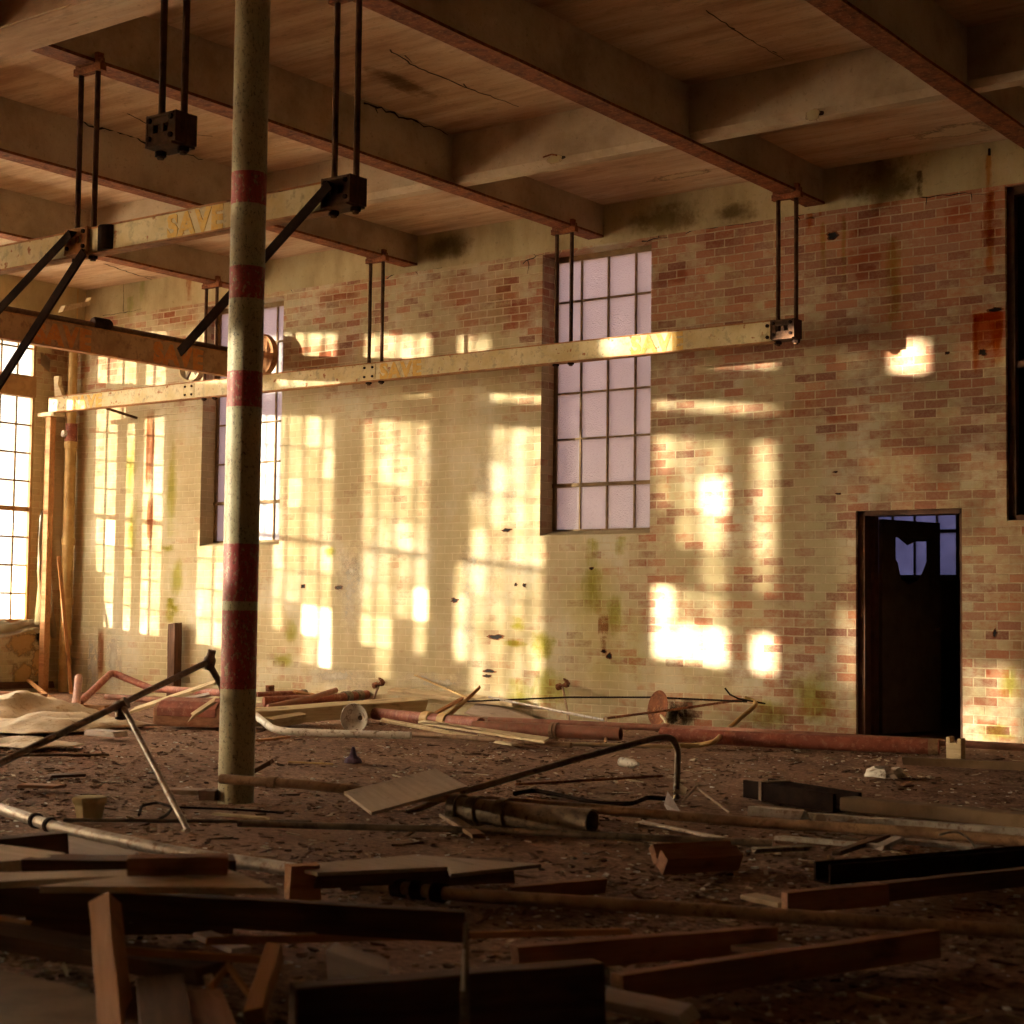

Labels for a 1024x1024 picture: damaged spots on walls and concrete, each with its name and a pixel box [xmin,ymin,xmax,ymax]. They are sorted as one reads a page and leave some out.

crack [706,10,784,60]
crack [390,49,519,107]
crack [364,102,448,135]